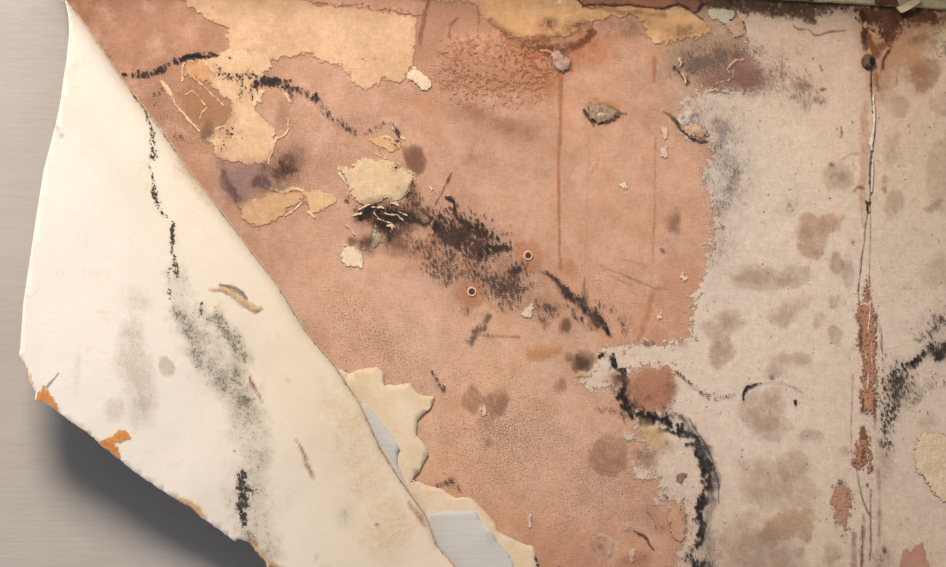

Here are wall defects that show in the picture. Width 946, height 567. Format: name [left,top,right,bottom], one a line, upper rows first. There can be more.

peeling [19,0,455,567]
damp [104,49,628,346]
flaking render [304,0,566,114]
damp [574,351,774,567]
damp [671,31,826,267]
crack [868,70,876,200]
damp [874,299,946,462]